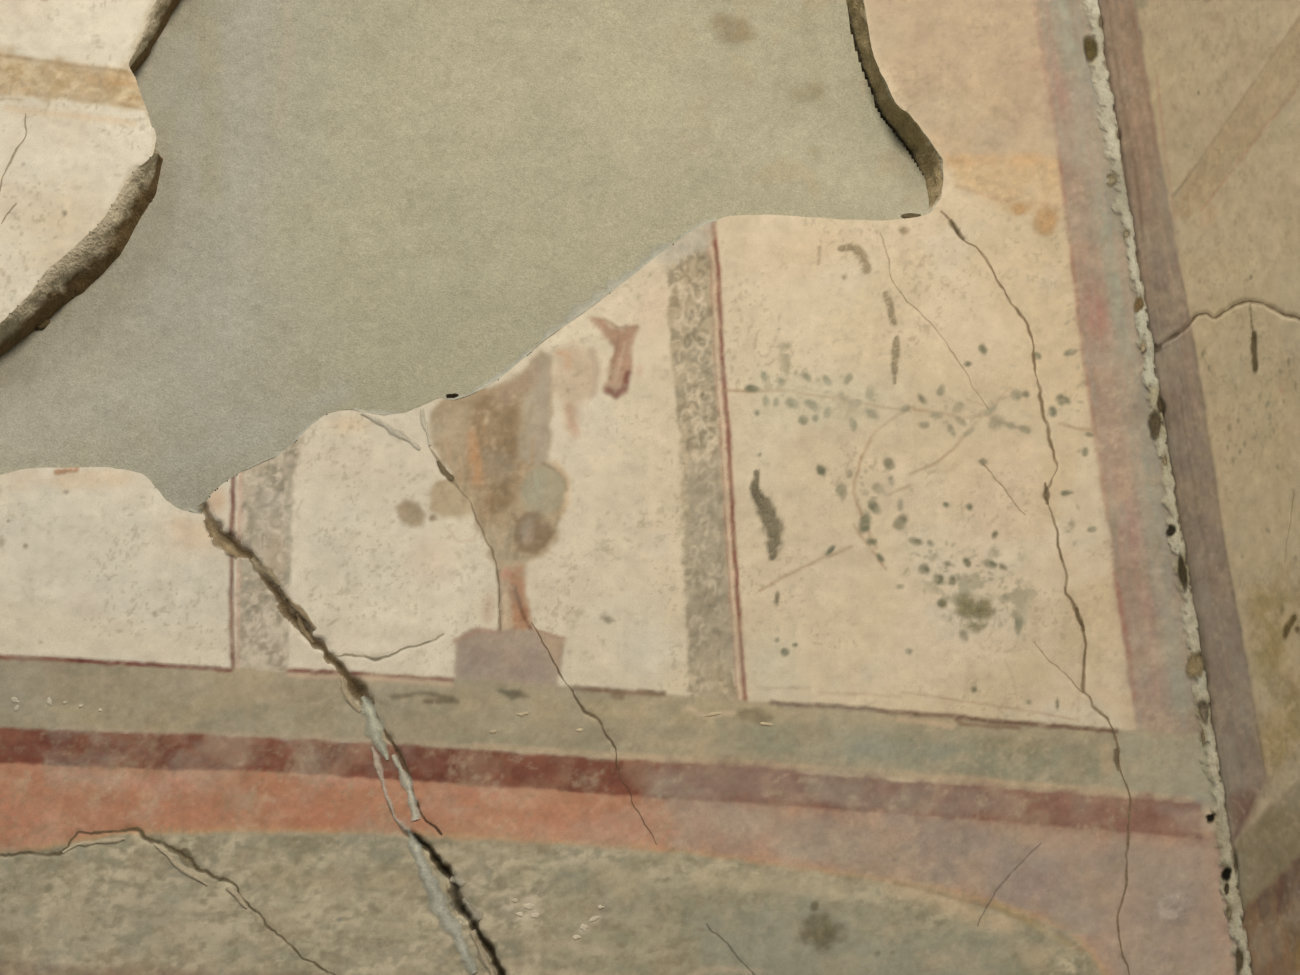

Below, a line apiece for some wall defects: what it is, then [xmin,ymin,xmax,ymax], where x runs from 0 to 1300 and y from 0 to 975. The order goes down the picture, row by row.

crack [0,827,336,975]
crack [199,502,506,975]
flaking render [0,0,944,514]
crack [946,215,1131,975]
crack [1084,0,1300,975]